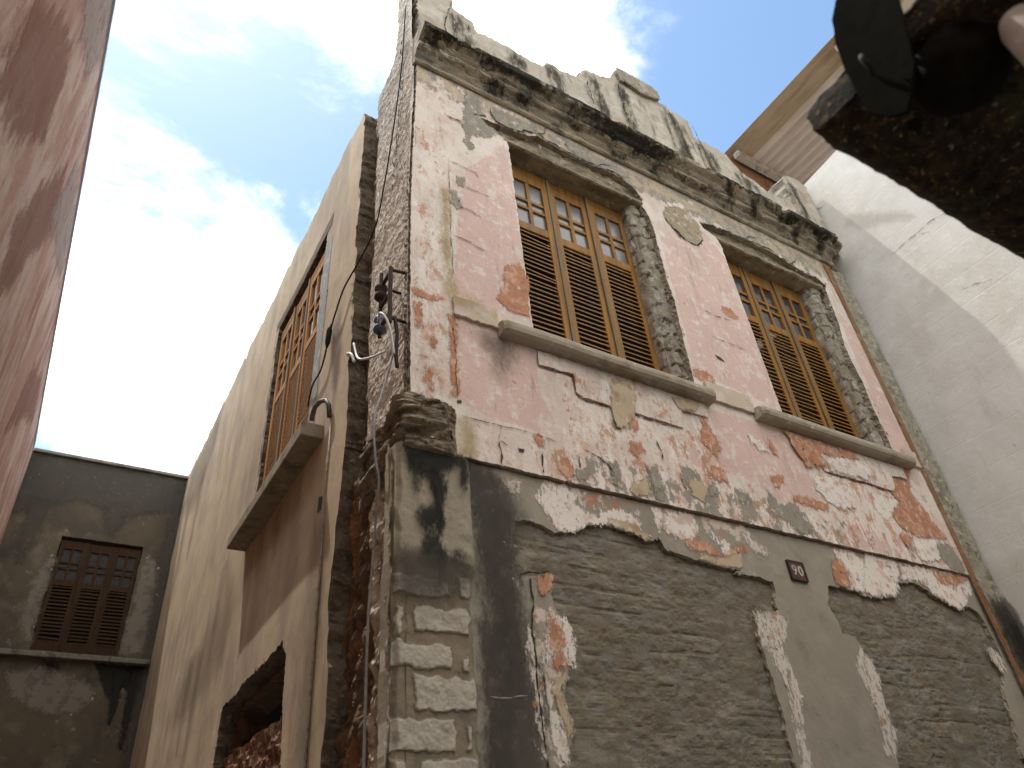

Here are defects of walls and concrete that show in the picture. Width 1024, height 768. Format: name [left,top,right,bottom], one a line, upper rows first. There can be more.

water stain [14,0,187,768]
spalling [211,715,283,768]
spalling [335,0,462,768]
peeling [449,175,465,209]
water stain [401,441,547,768]
spalling [461,92,715,384]
water stain [423,13,837,255]
spalling [501,377,813,768]
spalling [663,200,1024,768]